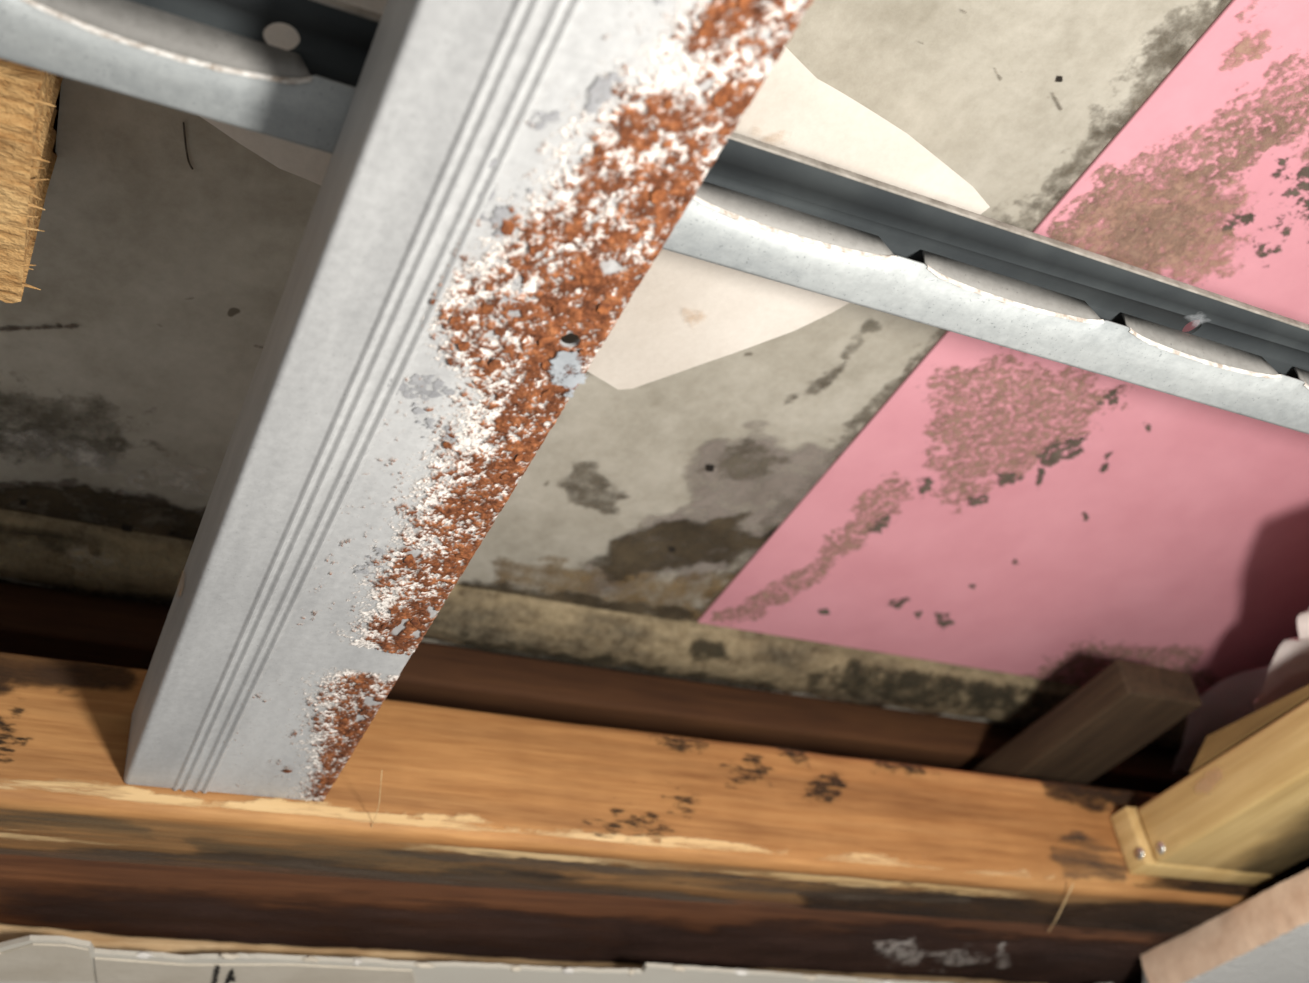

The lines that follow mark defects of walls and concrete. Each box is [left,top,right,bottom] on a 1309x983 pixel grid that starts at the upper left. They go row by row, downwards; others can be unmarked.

leakage [1049,31,1309,284]
rust [315,0,813,656]
leakage [0,396,206,606]
leakage [460,347,1127,622]
leakage [0,653,134,693]
rust [270,668,400,802]
leakage [459,634,777,693]
leakage [722,747,847,803]
leakage [889,598,955,630]
leakage [810,642,1231,723]
leakage [1041,781,1152,811]
leakage [0,821,1309,983]